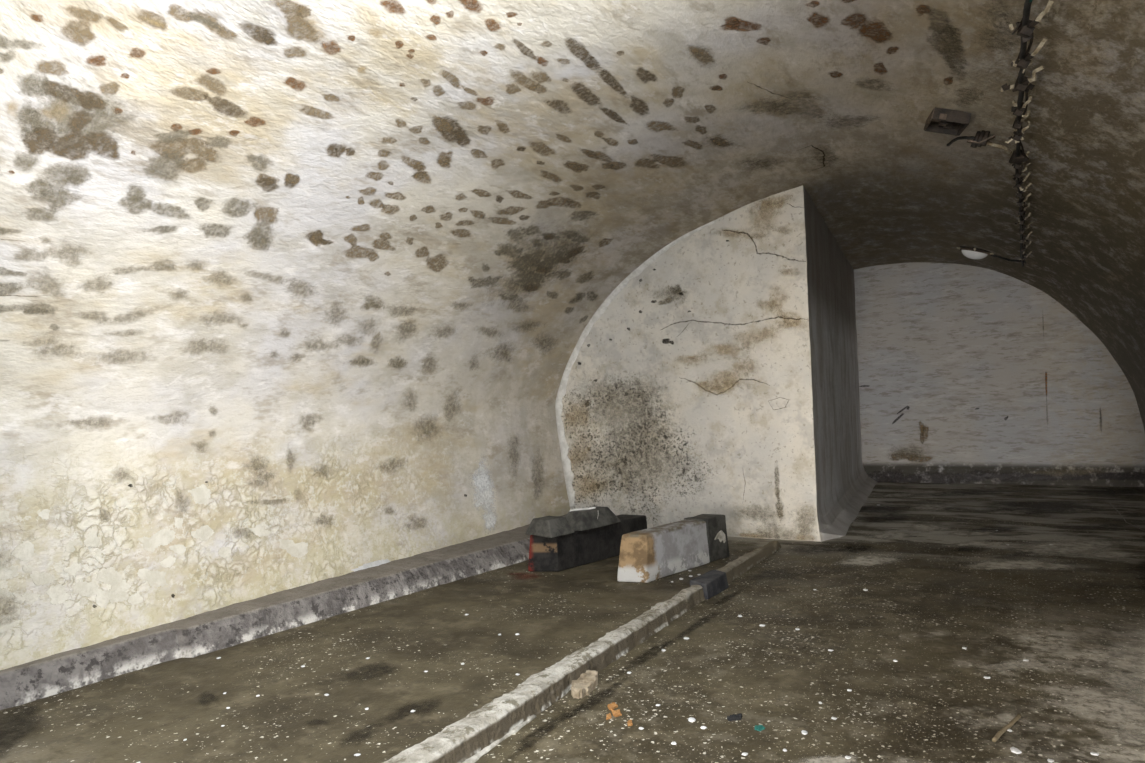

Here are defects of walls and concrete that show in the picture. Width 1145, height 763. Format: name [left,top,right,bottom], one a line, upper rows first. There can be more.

water stain [63,6,127,44]
water stain [139,5,237,38]
water stain [558,38,673,131]
water stain [10,61,127,220]
water stain [327,144,355,157]
water stain [248,156,299,191]
water stain [121,186,209,233]
water stain [346,117,685,322]
water stain [308,224,447,272]
crack [723,230,806,262]
crack [661,316,803,337]
crack [679,377,788,410]